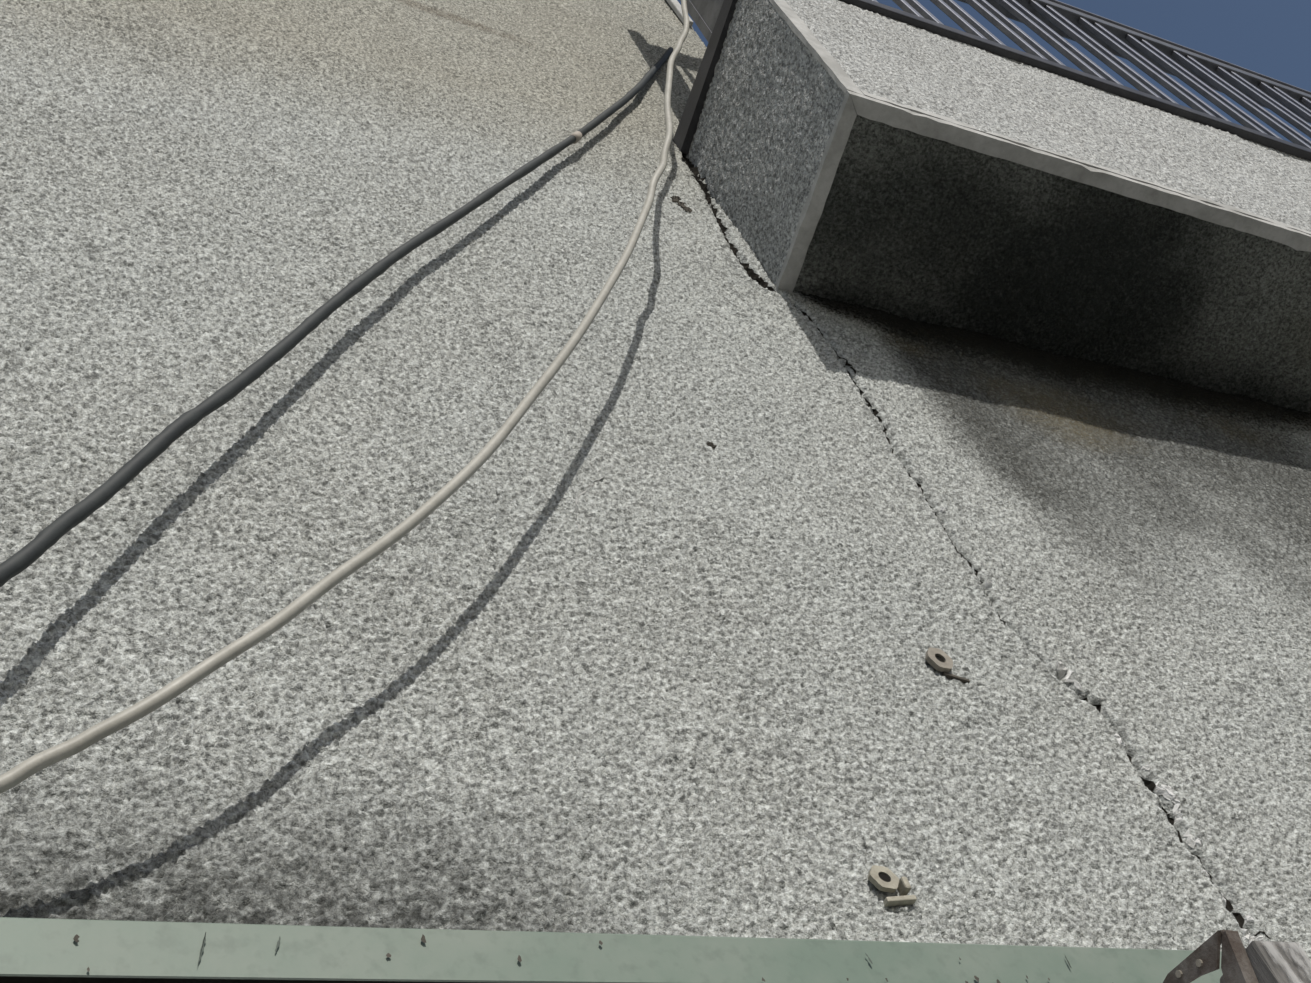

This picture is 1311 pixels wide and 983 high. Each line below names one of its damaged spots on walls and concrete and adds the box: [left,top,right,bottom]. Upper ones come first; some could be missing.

crack [682,153,1006,624]
crack [1027,648,1272,940]